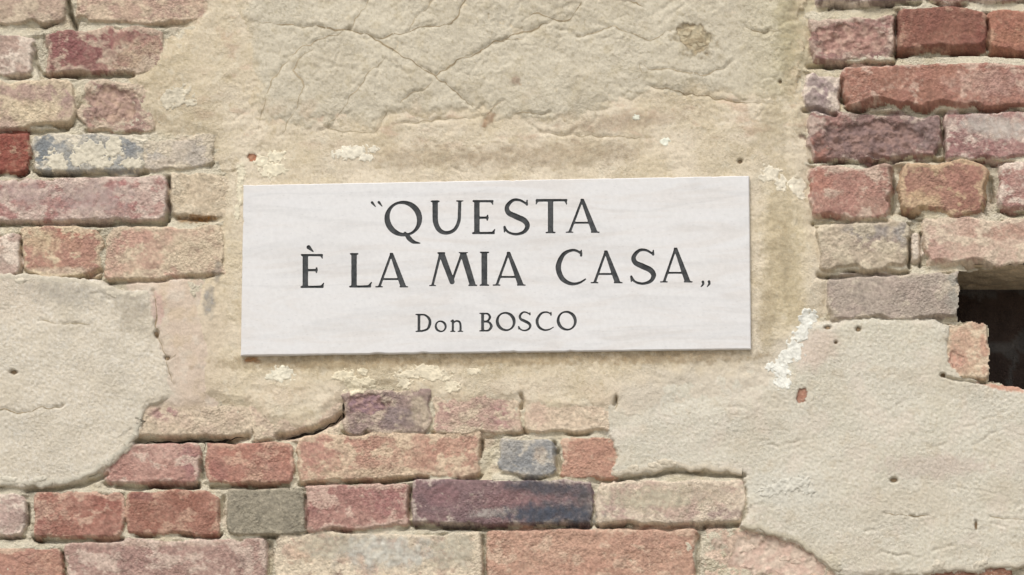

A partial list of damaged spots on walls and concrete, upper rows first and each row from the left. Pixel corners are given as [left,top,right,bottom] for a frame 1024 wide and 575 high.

spalling [816,21,887,57]
crack [250,0,775,139]
peeling [160,83,197,112]
peeling [42,86,153,177]
peeling [0,273,148,300]
spalling [957,265,1024,389]
peeling [330,363,483,415]
peeling [0,409,146,489]
peeling [611,459,742,478]